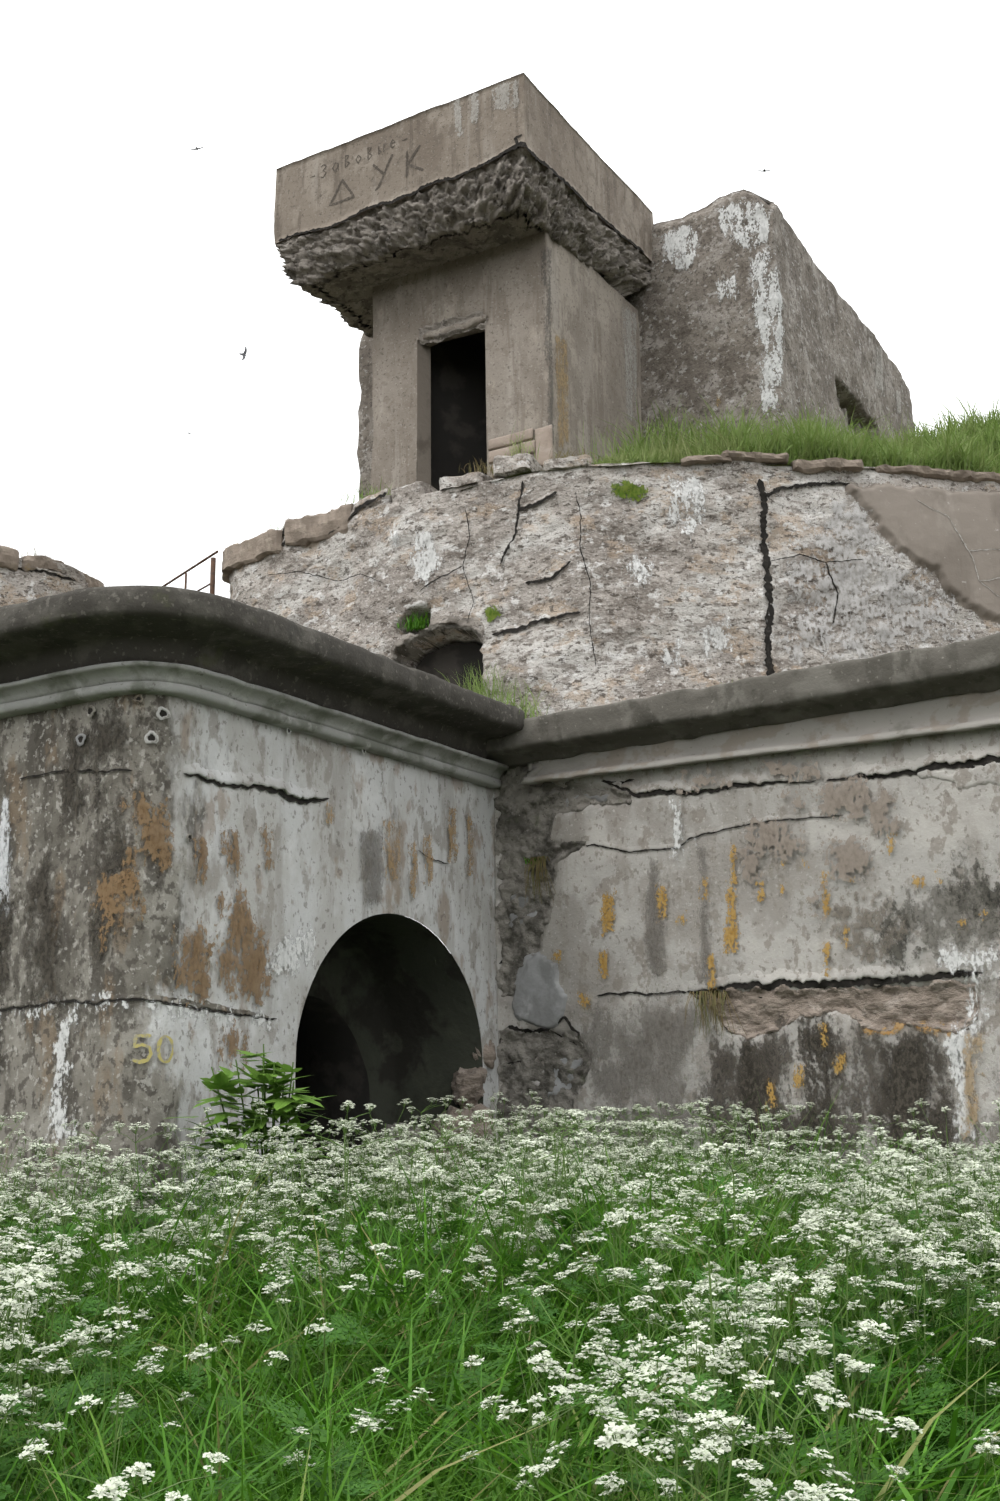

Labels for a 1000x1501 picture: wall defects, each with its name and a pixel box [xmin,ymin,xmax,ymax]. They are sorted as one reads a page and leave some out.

spalling [275,147,651,338]
efflorescence [716,200,785,415]
crack [757,477,862,676]
crack [586,744,1000,853]
damp [0,797,272,1145]
spalling [374,766,632,1192]
rust [597,888,617,979]
rust [655,845,831,990]
damp [573,797,1000,1174]
crack [597,959,984,1002]
rust [818,1023,846,1075]
spalling [697,979,980,1041]